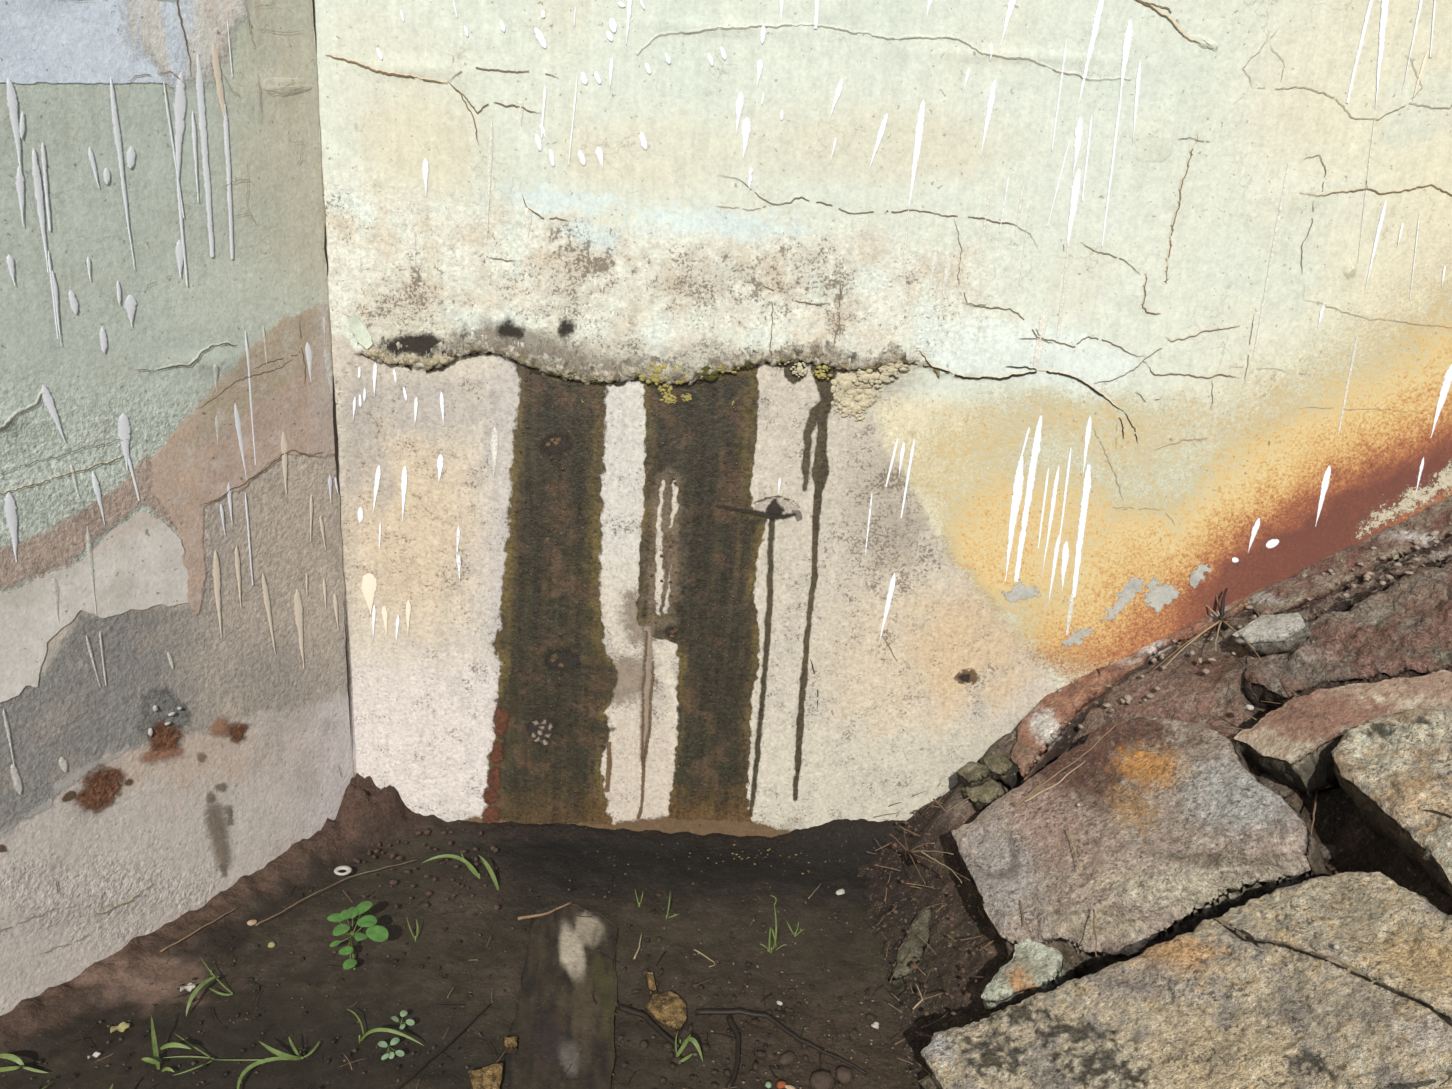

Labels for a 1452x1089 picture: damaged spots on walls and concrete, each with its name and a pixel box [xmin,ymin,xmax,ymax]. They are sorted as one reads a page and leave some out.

spalling [137,689,191,764]
peeling [0,303,335,703]
peeling [121,0,247,91]
crack [127,0,558,774]
damp [466,362,792,837]
spalling [348,314,940,421]
spalling [716,495,802,521]
damp [784,365,837,801]
crack [718,133,1422,525]
crack [1137,0,1213,49]
corrosion [911,281,1452,680]
crack [1300,155,1452,328]